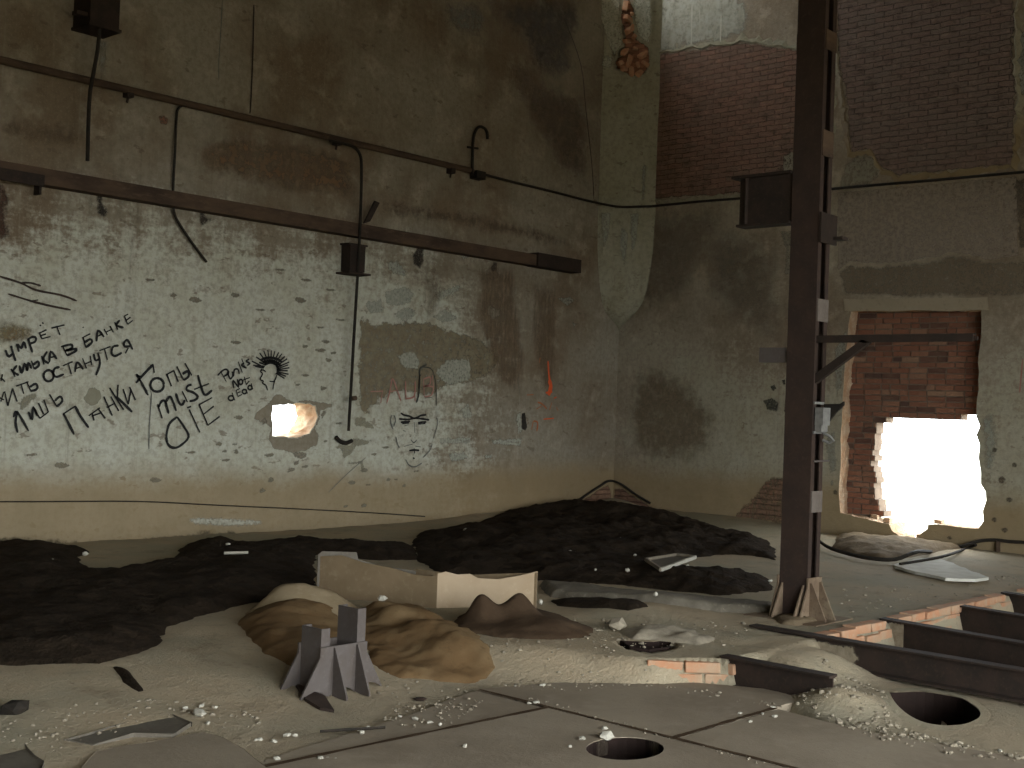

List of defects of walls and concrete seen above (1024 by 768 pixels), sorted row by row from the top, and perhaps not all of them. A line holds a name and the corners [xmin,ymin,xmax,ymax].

flaking render [601,0,797,205]
flaking render [833,0,1024,186]
peeling [234,249,499,485]
peeling [485,413,527,459]
flaking render [737,478,783,523]